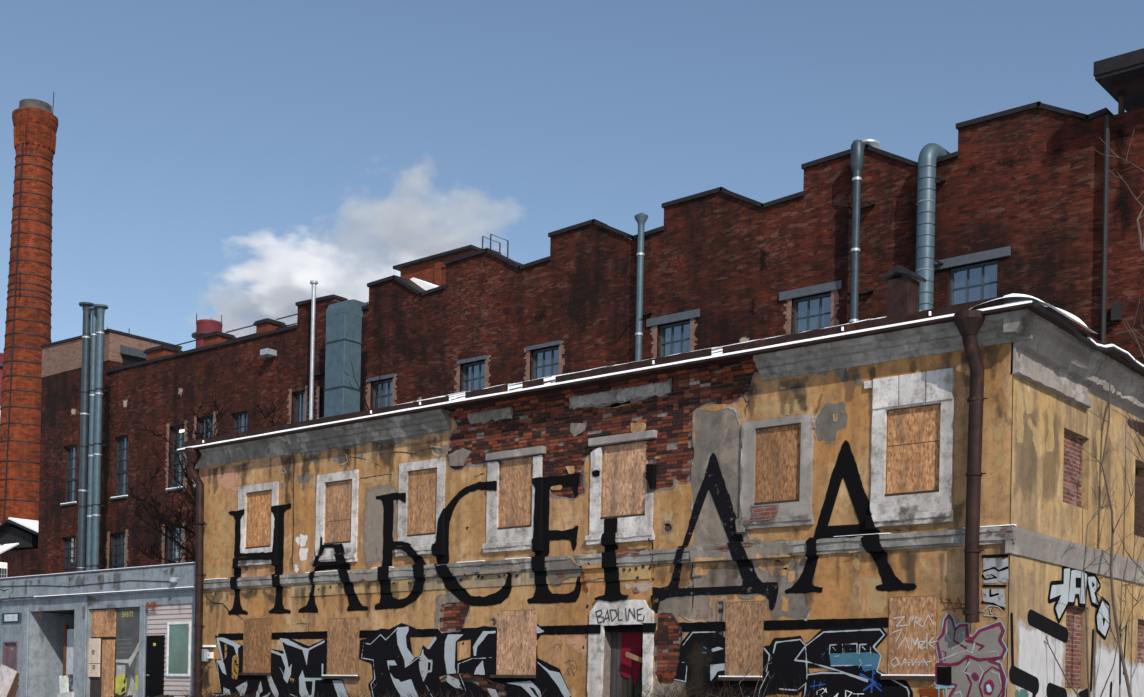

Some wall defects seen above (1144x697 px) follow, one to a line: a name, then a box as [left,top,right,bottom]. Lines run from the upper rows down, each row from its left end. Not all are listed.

flaking render [201,370,848,697]
leakage [796,395,819,413]